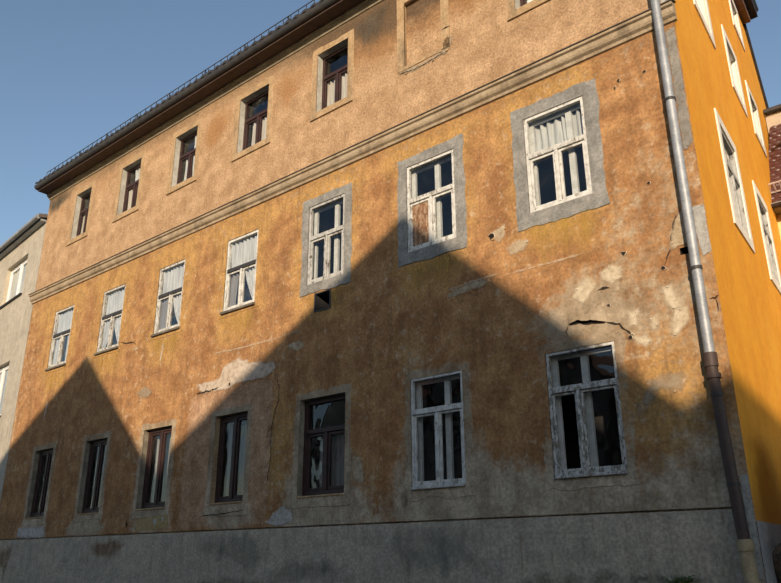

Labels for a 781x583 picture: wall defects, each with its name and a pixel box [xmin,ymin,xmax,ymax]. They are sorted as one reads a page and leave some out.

spalling [573,266,621,303]
spalling [628,310,652,346]
spalling [663,285,689,335]
spalling [198,359,276,392]
spalling [265,507,292,526]